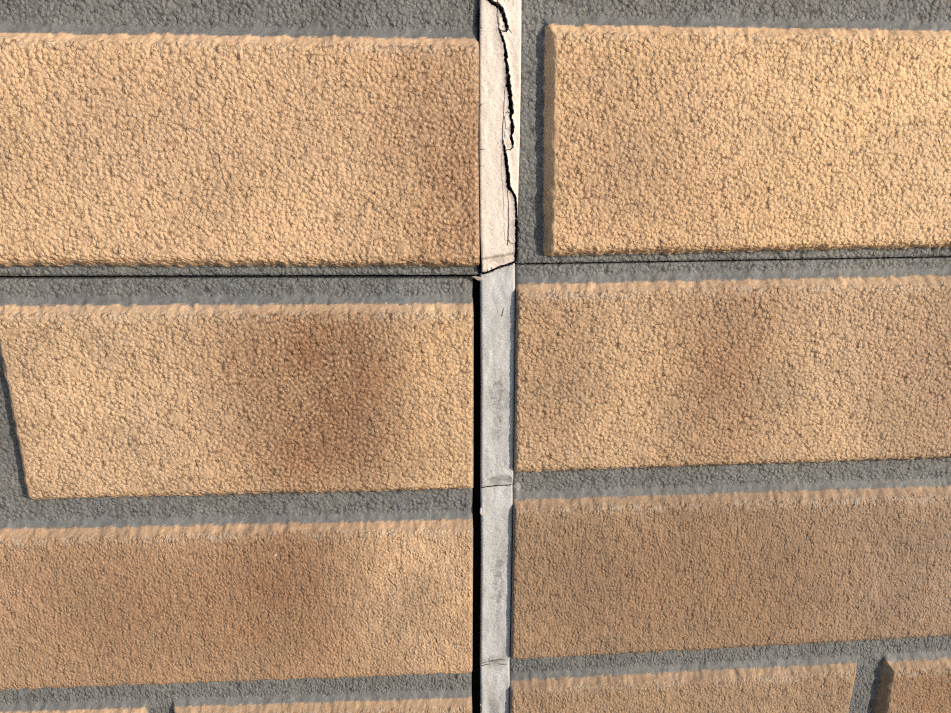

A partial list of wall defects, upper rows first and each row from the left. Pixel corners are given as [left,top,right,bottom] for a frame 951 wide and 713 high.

crack [478,0,518,262]